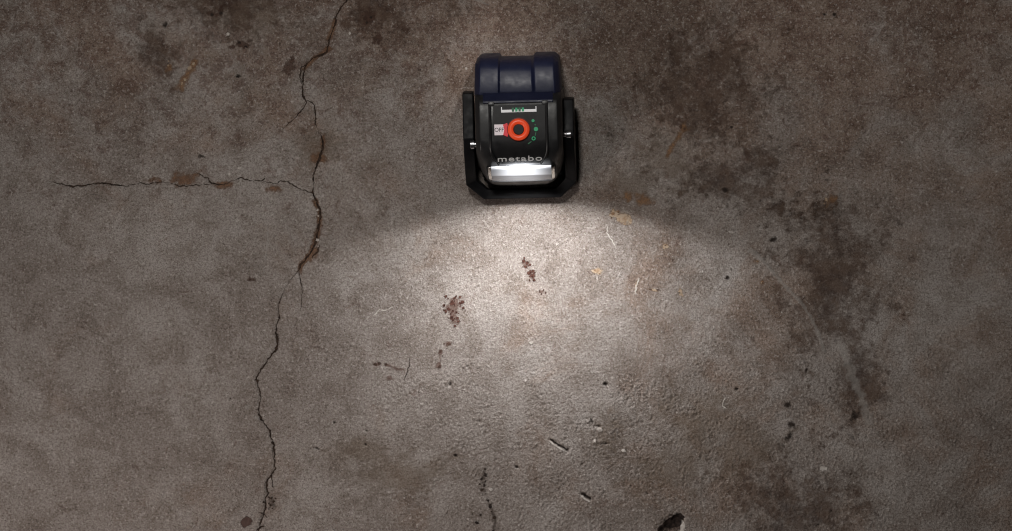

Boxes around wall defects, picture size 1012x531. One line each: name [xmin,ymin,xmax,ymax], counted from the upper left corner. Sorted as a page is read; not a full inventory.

crack [49,0,348,531]